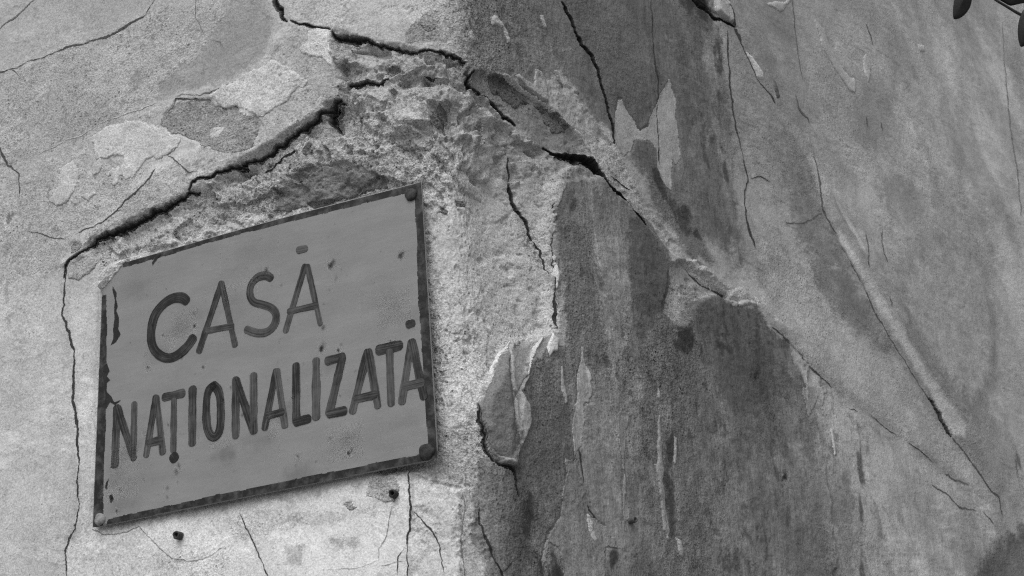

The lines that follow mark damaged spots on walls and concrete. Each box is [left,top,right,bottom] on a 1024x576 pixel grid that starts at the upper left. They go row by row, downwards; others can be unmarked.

peeling [92,60,308,186]
crack [273,0,516,126]
spalling [487,69,591,152]
crack [505,2,647,329]
peeling [614,79,681,190]
water stain [653,169,700,237]
crack [0,78,389,576]
peeling [489,333,559,447]
water stain [674,327,694,352]
crack [326,471,515,576]
water stain [539,552,563,576]
water stain [666,431,675,534]